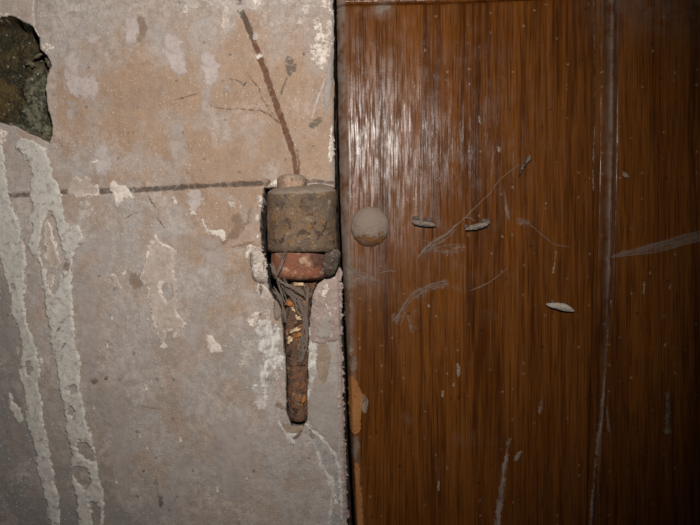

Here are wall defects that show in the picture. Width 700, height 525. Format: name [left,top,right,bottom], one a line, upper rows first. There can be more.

spalling [0,0,162,142]
crack [100,180,270,205]
damp [43,219,61,289]
damp [239,319,285,412]
damp [8,392,24,424]